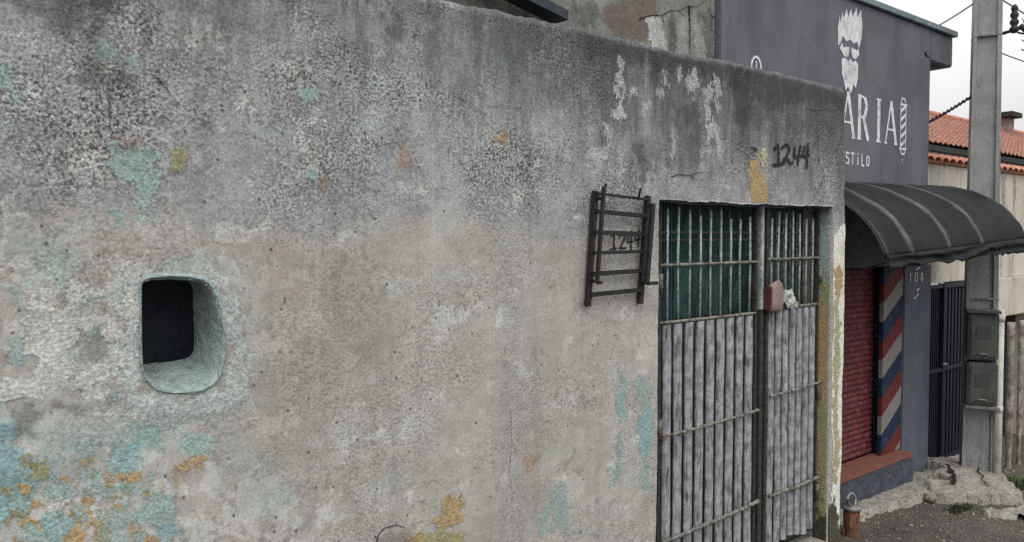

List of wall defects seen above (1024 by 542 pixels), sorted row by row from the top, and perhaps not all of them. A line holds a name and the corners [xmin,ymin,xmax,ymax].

crack [639,0,716,56]
water stain [585,56,723,166]
peeling [106,140,188,228]
peeling [0,279,194,542]
peeling [174,431,215,475]
peeling [607,367,653,489]
water stain [813,272,841,542]
peeling [404,493,466,542]